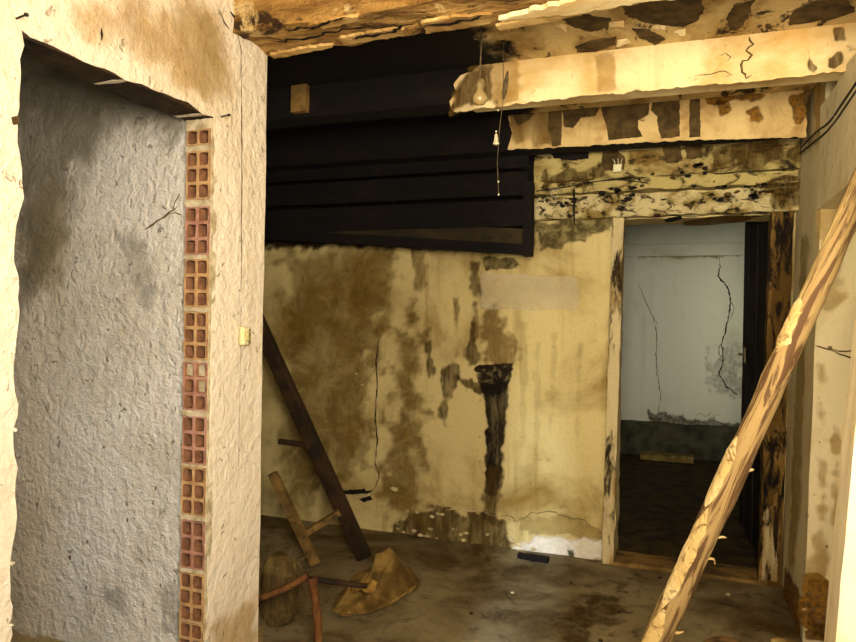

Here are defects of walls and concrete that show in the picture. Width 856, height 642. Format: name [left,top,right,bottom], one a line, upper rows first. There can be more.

peeling [449,0,856,203]
water stain [265,196,523,211]
water stain [266,155,605,198]
spalling [538,198,578,214]
water stain [264,239,395,480]
crack [344,340,398,502]
water stain [379,305,517,524]
crack [638,283,661,413]
crack [718,256,740,397]
flaking render [393,507,602,549]
rust [783,568,829,641]